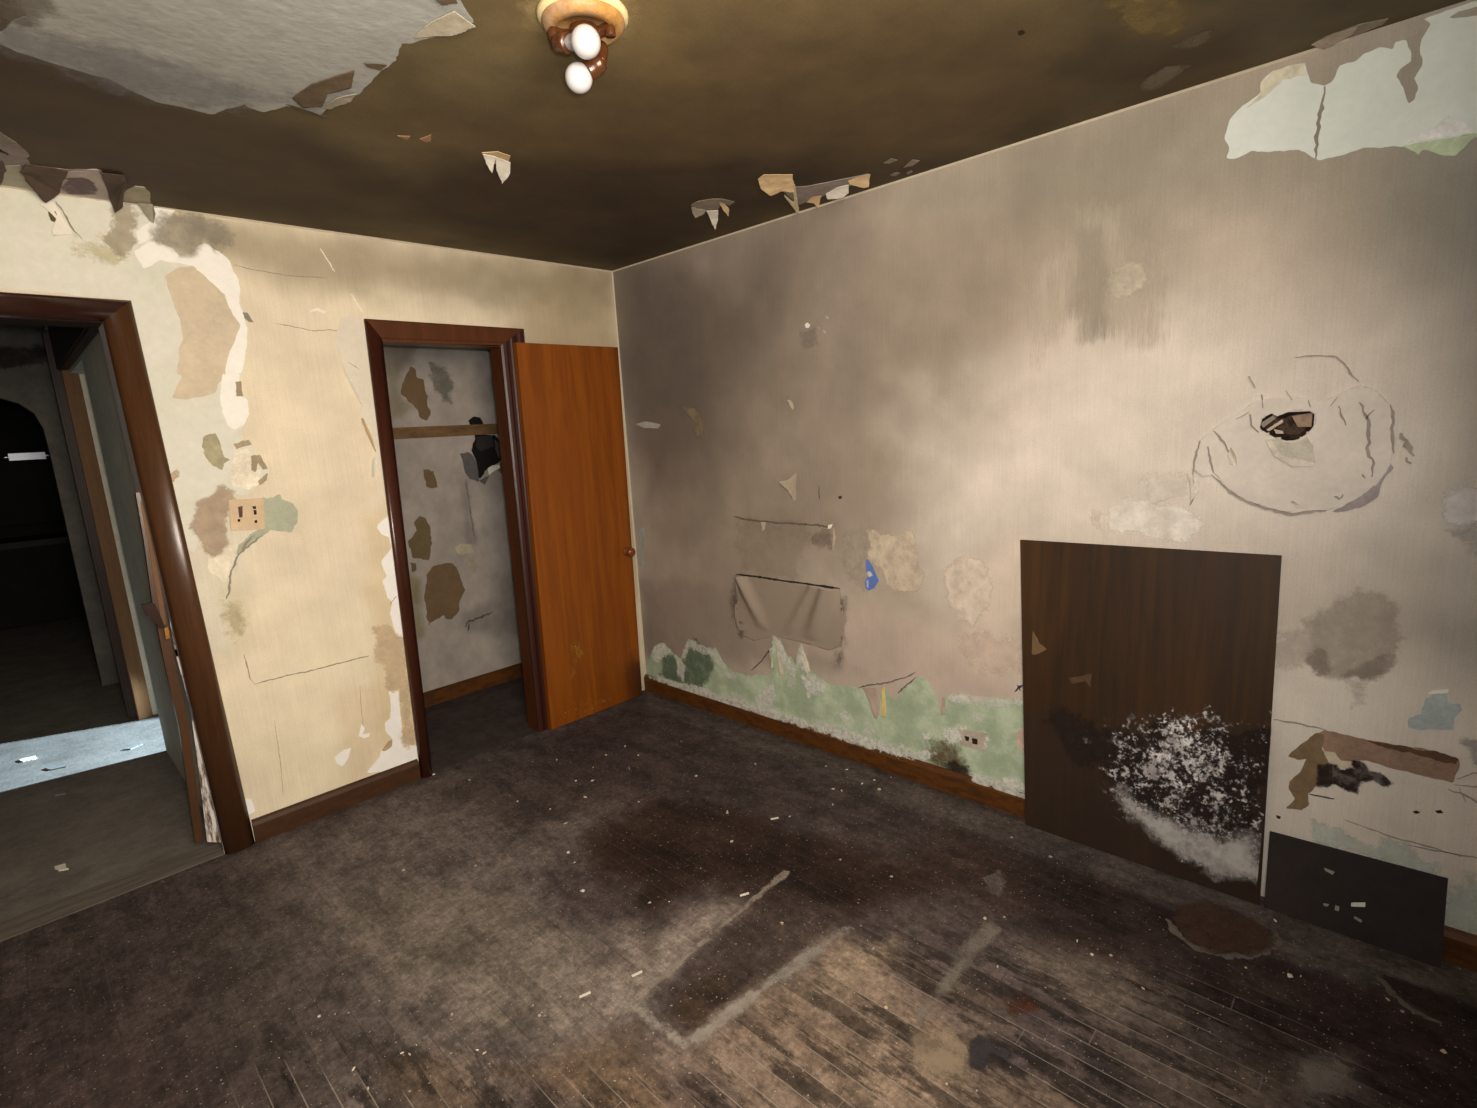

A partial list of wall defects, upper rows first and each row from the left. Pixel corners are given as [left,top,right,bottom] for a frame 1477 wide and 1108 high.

peeling [0,0,476,118]
peeling [1225,1,1477,160]
peeling [691,199,734,230]
peeling [758,174,870,214]
peeling [0,132,298,583]
peeling [309,308,386,499]
peeling [401,367,431,421]
spalling [460,417,503,484]
peeling [377,516,478,637]
water stain [1276,594,1398,687]
peeling [646,635,1025,799]
peeling [1273,689,1462,819]